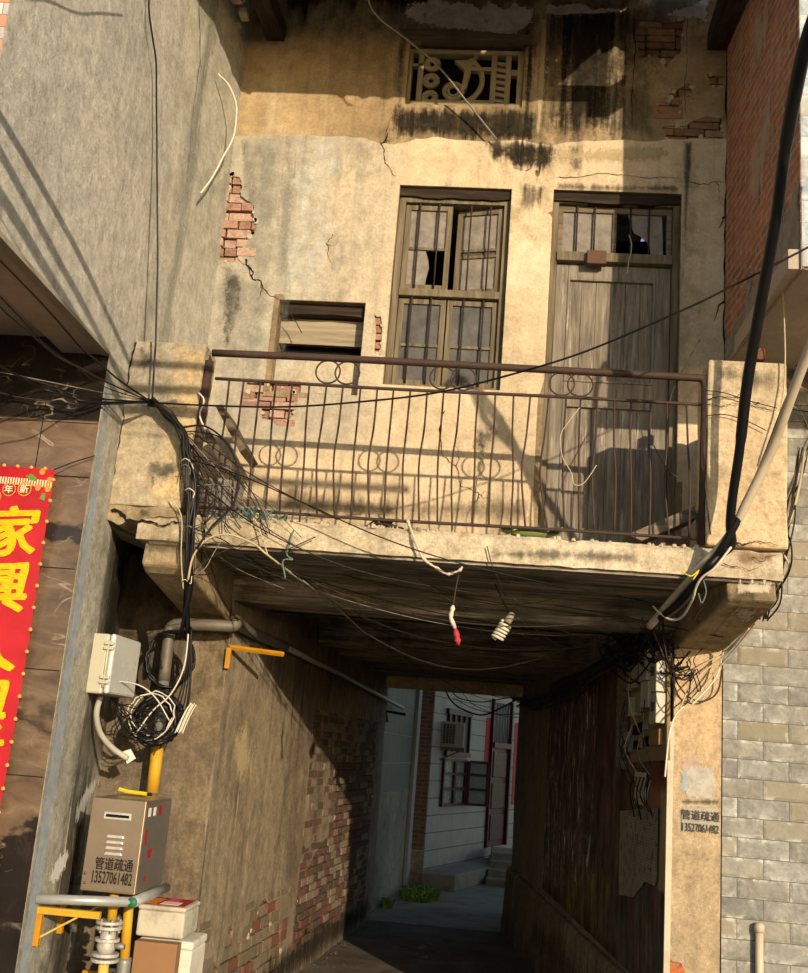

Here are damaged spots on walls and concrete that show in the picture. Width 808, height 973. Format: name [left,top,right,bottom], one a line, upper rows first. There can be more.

spalling [231,0,250,29]
peeling [404,0,622,34]
spalling [636,0,711,68]
leakage [393,5,635,176]
spalling [557,84,725,161]
spalling [219,171,259,262]
crack [239,259,278,299]
spalling [242,378,301,427]
crack [111,508,185,536]
peeling [682,762,716,800]
spalling [670,959,685,973]